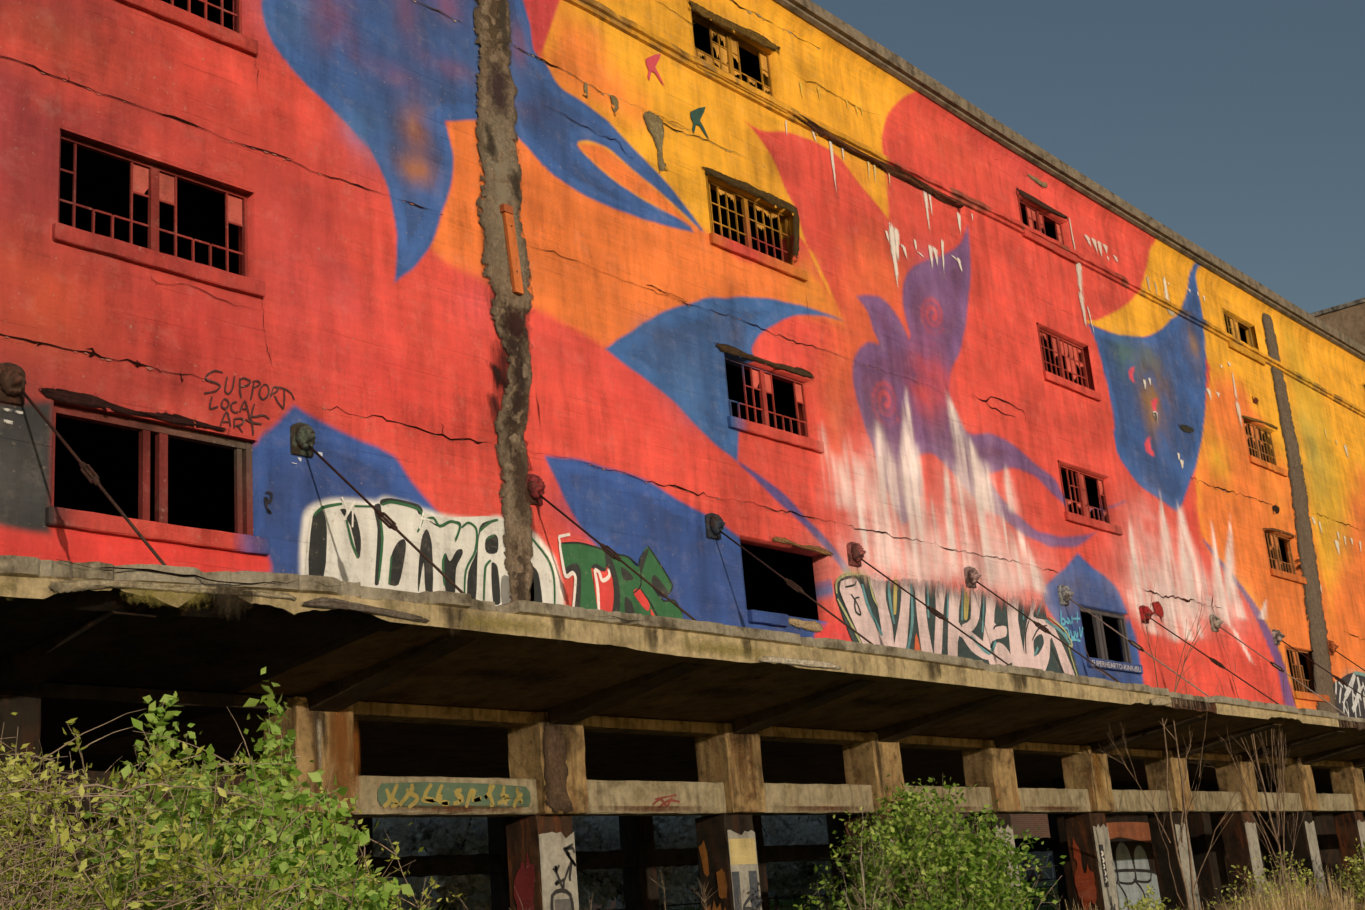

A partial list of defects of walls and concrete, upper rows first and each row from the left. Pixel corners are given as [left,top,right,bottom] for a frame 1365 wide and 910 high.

crack [0,56,444,215]
crack [0,333,212,383]
crack [323,406,492,444]
peeling [473,0,534,602]